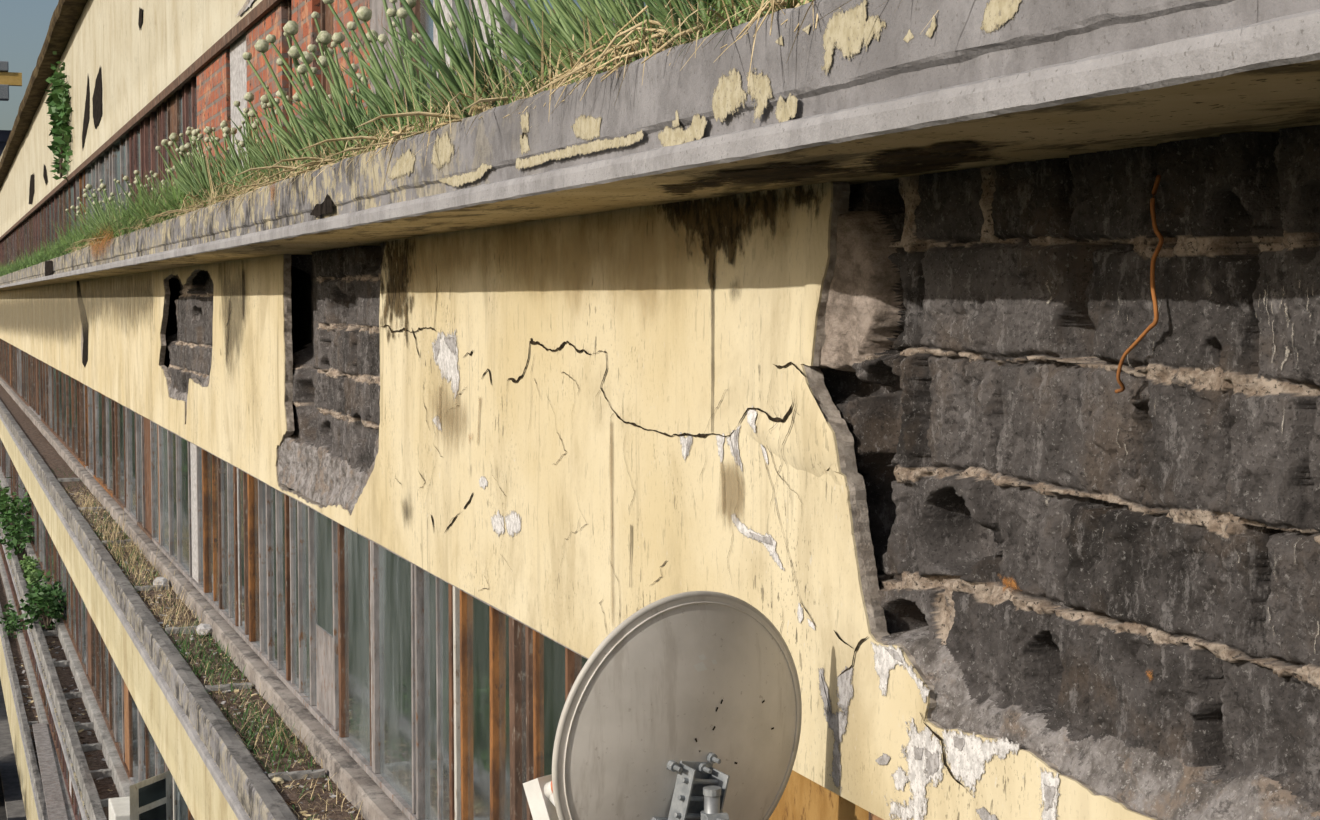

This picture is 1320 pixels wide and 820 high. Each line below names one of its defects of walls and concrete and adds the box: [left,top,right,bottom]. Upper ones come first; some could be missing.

peeling [802,0,886,75]
peeling [903,14,936,43]
peeling [980,0,1022,34]
peeling [388,132,492,187]
peeling [516,67,798,171]
spalling [166,270,214,417]
spalling [278,243,386,514]
peeling [432,328,460,400]
leakage [654,141,1006,432]
corrosion [1115,175,1164,393]
crack [395,338,868,714]
spalling [818,125,1320,820]